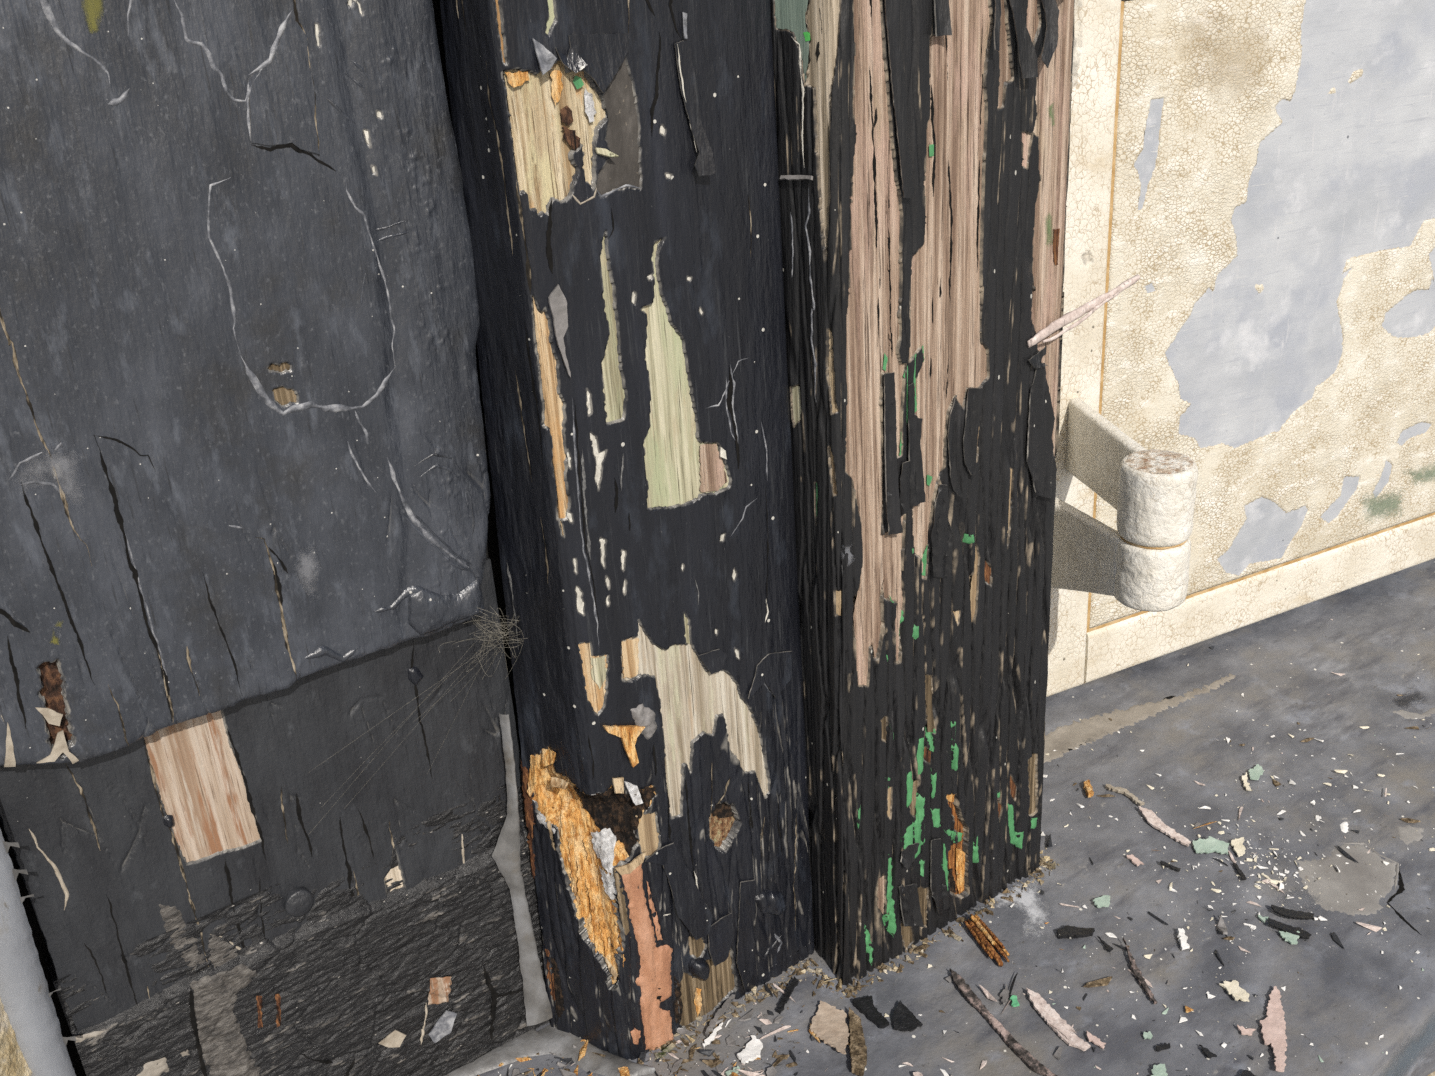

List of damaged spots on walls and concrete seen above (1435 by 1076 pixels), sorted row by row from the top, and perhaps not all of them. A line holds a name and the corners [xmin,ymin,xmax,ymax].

crack [247,0,320,155]
crack [0,312,129,746]
crack [94,435,200,721]
crack [204,577,242,694]
peeling [516,182,573,534]
peeling [590,433,605,485]
peeling [587,213,625,422]
peeling [632,239,729,508]
peeling [578,614,792,856]
peeling [775,0,1074,685]
peeling [1165,0,1435,449]
peeling [136,710,266,1076]